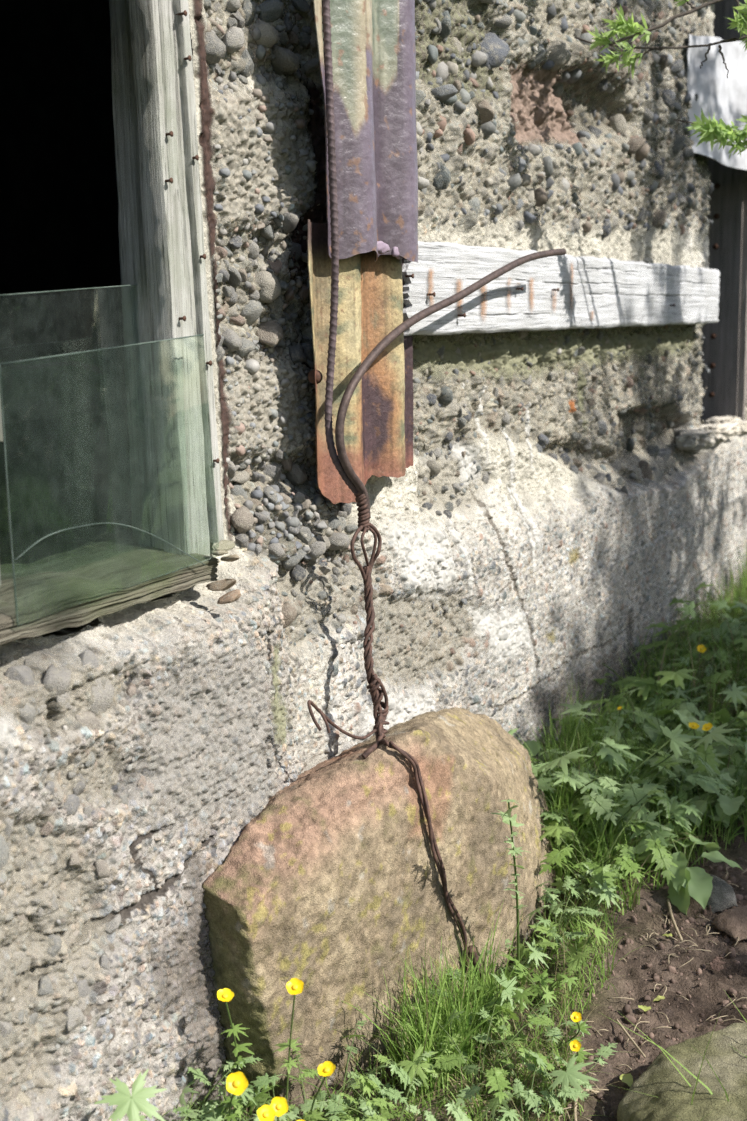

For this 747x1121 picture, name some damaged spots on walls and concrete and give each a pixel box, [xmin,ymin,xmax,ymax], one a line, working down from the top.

rust [194,0,231,538]
spalling [413,324,710,519]
crack [467,485,634,709]
crack [0,810,215,979]